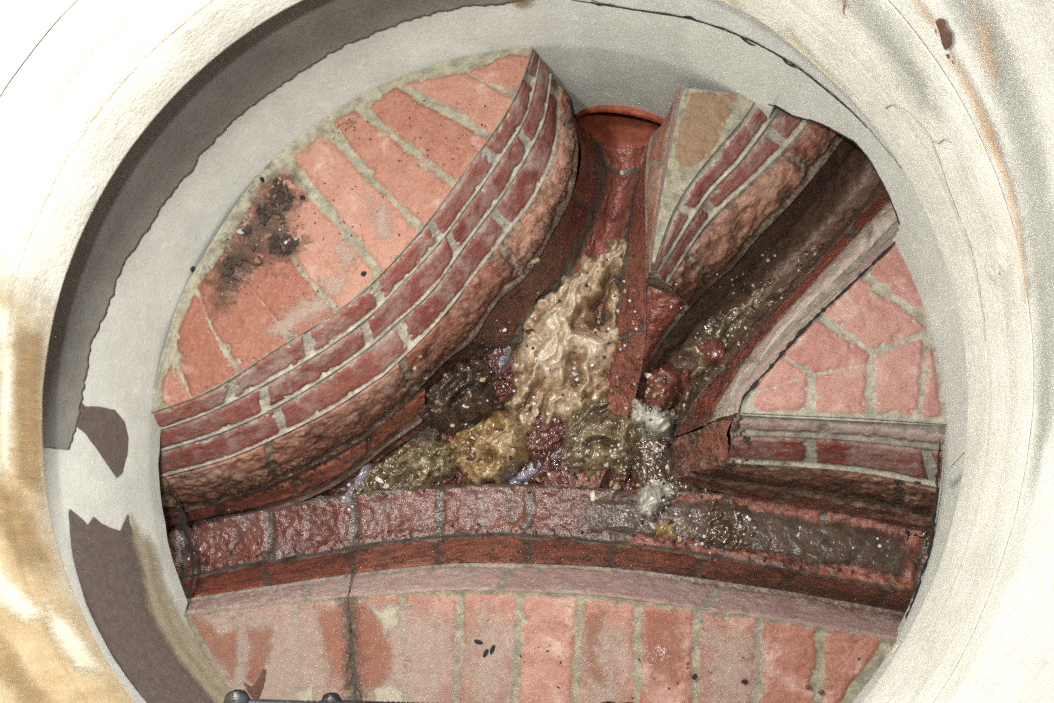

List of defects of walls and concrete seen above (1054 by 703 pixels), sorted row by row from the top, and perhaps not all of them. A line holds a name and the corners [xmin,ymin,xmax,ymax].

leakage [0,290,230,703]
crack [339,565,367,701]